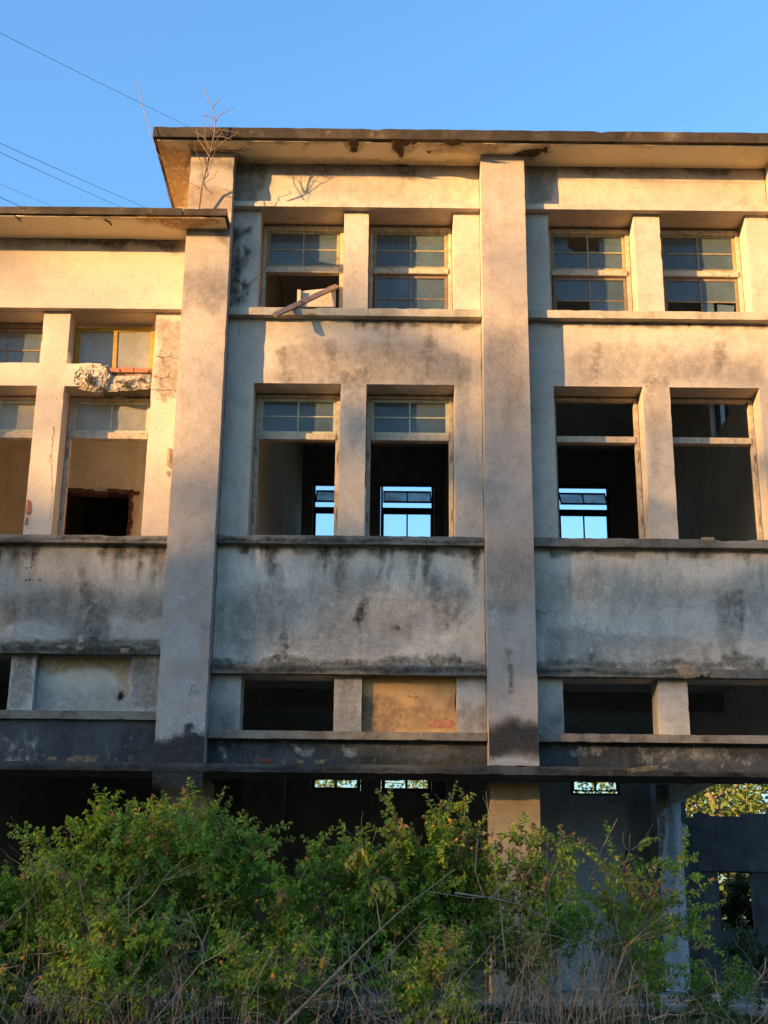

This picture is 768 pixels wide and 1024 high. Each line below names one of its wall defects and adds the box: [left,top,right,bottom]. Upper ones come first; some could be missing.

spalling [348,139,359,153]
spalling [392,139,421,158]
spalling [514,147,548,158]
mould [230,227,250,306]
spalling [73,364,153,392]
damp [489,702,765,777]